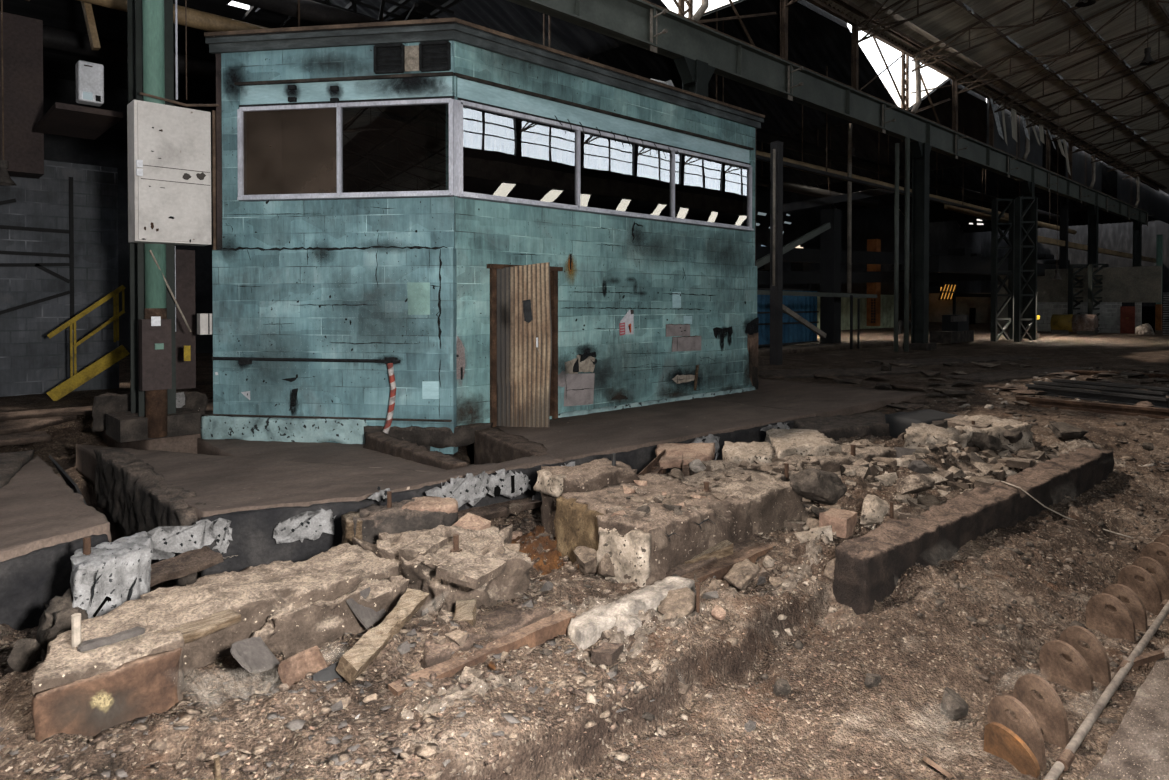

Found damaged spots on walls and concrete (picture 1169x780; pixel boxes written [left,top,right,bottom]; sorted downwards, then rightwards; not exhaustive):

crack [219,207,447,416]
peeling [146,518,233,560]
peeling [273,508,336,544]